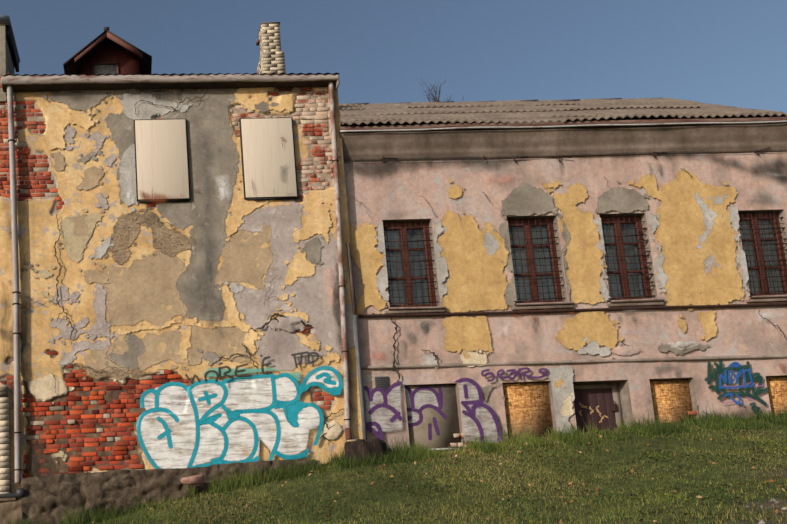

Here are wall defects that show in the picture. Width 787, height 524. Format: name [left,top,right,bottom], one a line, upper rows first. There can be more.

crack [27,214,74,344]
crack [51,341,129,393]
flaking render [0,87,387,478]
crack [390,317,400,382]
flaking render [421,353,438,369]
peeling [434,209,512,367]
peeling [541,180,623,358]
peeling [617,169,746,355]